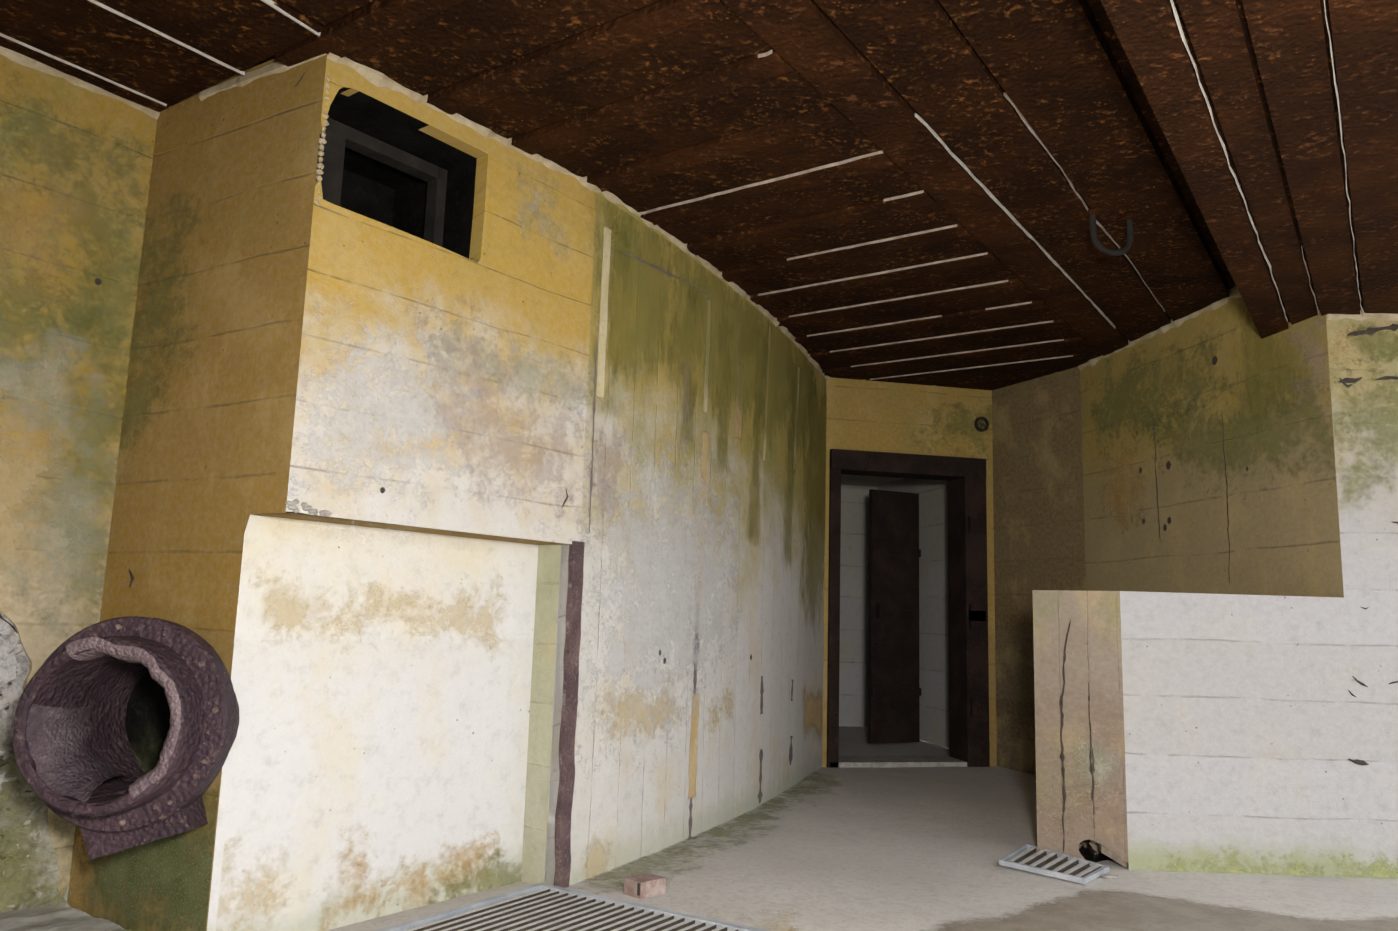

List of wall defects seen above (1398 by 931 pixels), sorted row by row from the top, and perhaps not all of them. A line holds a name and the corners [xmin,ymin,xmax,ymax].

leakage [0,33,167,106]
leakage [596,227,611,398]
leakage [587,326,770,798]
leakage [785,367,799,558]
spalling [0,612,68,914]
crack [1059,620,1095,852]